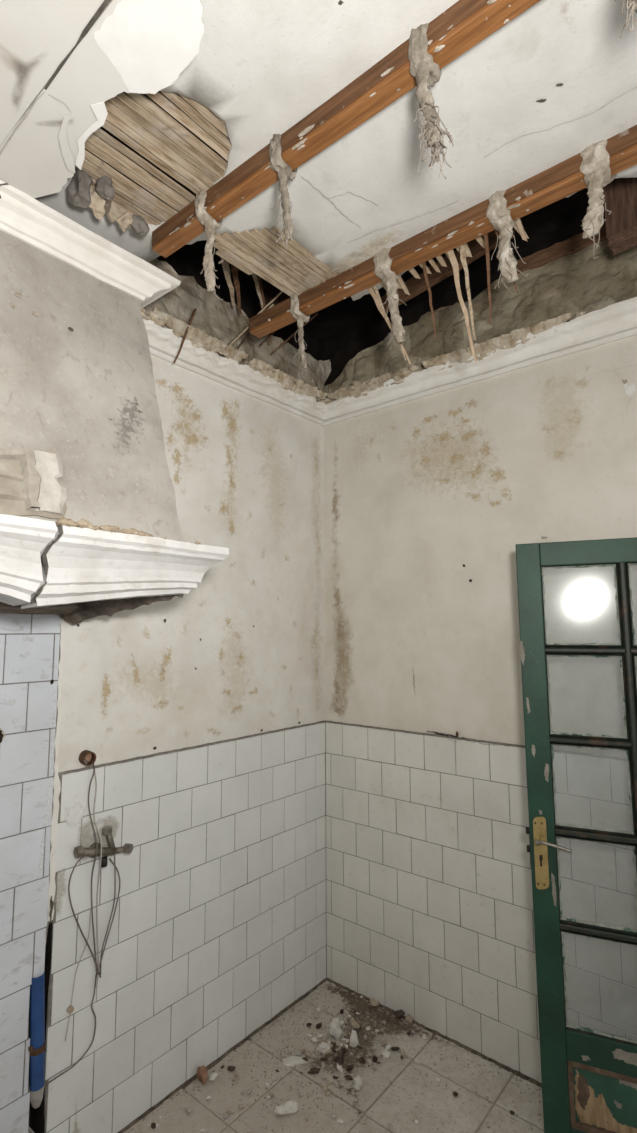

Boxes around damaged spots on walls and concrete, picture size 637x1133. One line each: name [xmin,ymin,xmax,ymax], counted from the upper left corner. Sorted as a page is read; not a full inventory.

crack [0,0,111,155]
peeling [94,0,204,94]
peeling [58,101,108,173]
flaking render [141,307,586,404]
flaking render [0,448,67,519]
crack [31,525,63,602]